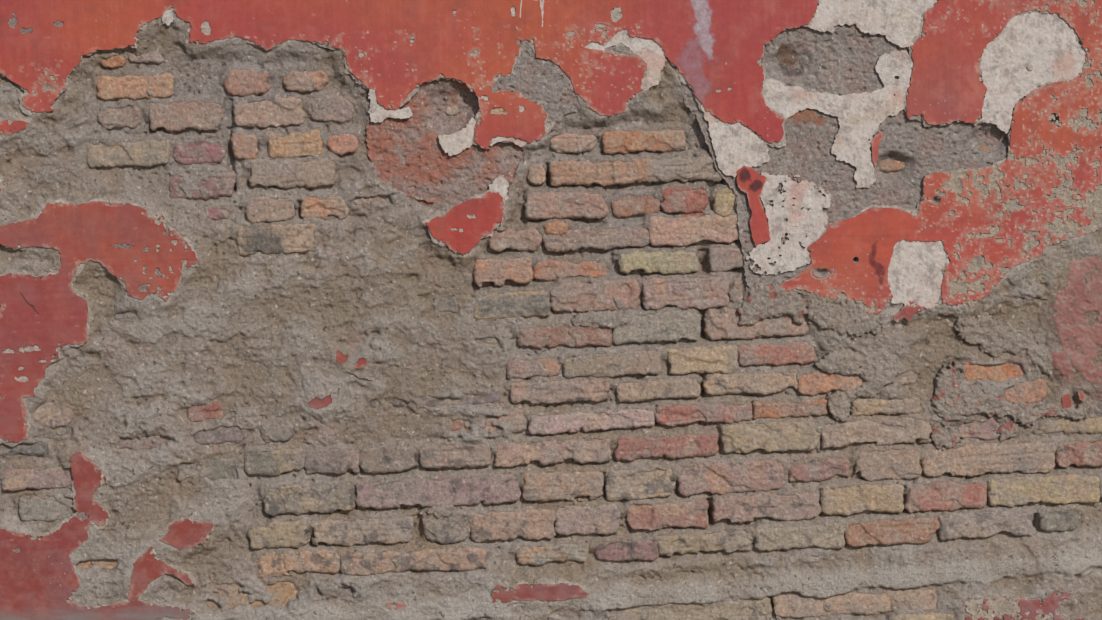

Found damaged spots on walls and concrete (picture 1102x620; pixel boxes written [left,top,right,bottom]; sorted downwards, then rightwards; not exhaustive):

peeling [808,0,937,48]
spalling [761,24,908,96]
peeling [762,78,880,119]
peeling [438,117,476,156]
peeling [1007,140,1084,177]
peeling [970,163,1034,217]